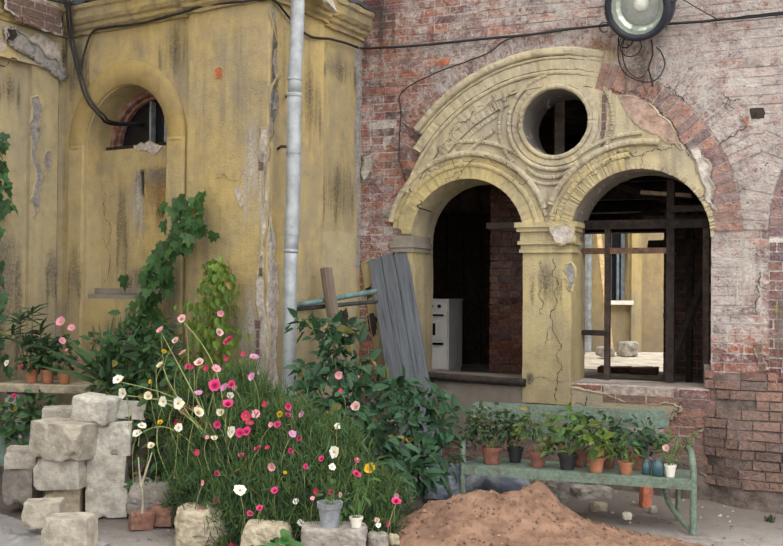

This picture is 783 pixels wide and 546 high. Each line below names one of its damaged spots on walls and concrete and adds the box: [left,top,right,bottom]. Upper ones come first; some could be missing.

flaking render [0,0,68,82]
flaking render [29,95,53,219]
spalling [253,5,280,393]
crack [420,89,526,190]
flaking render [548,223,576,246]
flaking render [563,261,577,292]
flaking render [595,90,717,210]
crack [719,94,747,146]
crack [532,258,587,407]